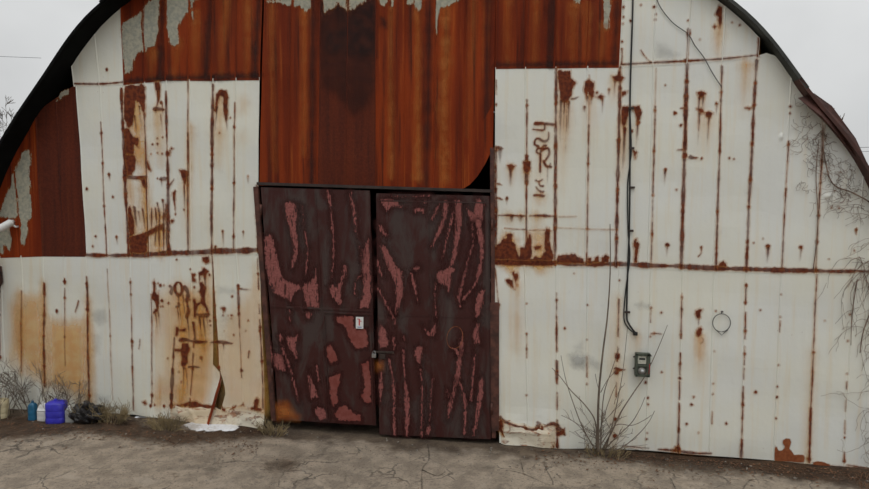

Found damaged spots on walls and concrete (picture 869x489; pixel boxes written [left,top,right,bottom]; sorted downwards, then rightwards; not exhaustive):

peeling [120,0,194,74]
peeling [267,0,311,12]
peeling [323,0,366,13]
rust [326,0,385,55]
peeling [435,0,459,35]
peeling [603,0,611,30]
peeling [0,149,32,254]
rust [74,0,264,411]
rust [485,3,868,468]
rust [20,276,90,402]
peeling [264,190,433,437]
peeling [381,194,486,437]